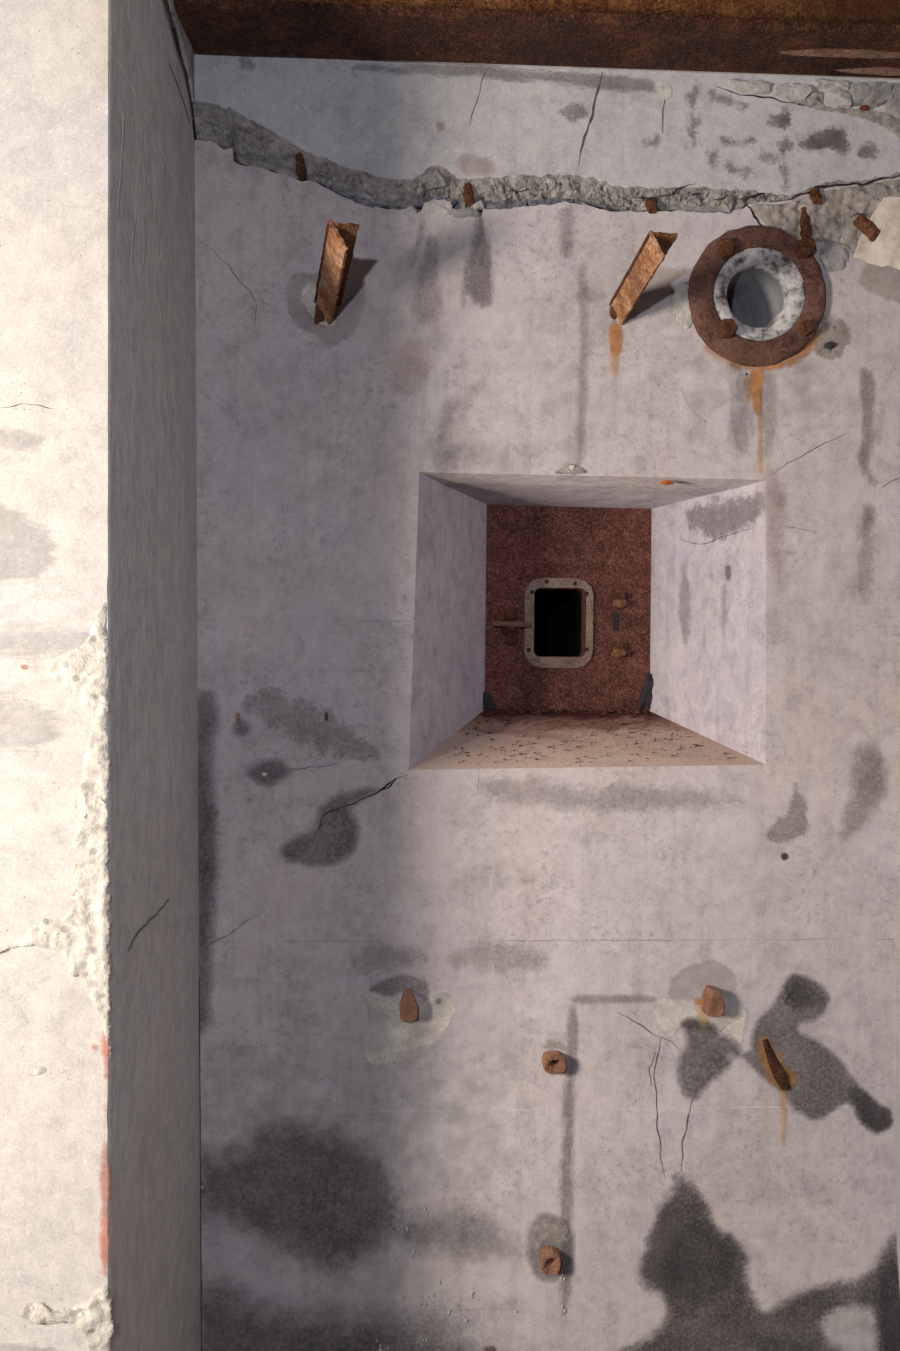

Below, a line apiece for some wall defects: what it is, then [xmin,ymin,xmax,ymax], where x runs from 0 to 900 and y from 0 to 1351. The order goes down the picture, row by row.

spalling [295,153,307,180]
spalling [463,183,475,207]
crack [169,63,900,226]
rust [609,324,622,373]
spalling [0,603,111,1050]
crack [312,775,406,845]
crack [617,1012,693,1177]
rust [759,1037,797,1113]
leakage [681,975,890,1130]
leakage [207,1134,382,1258]
spalling [18,1286,113,1351]
leakage [626,1182,900,1351]